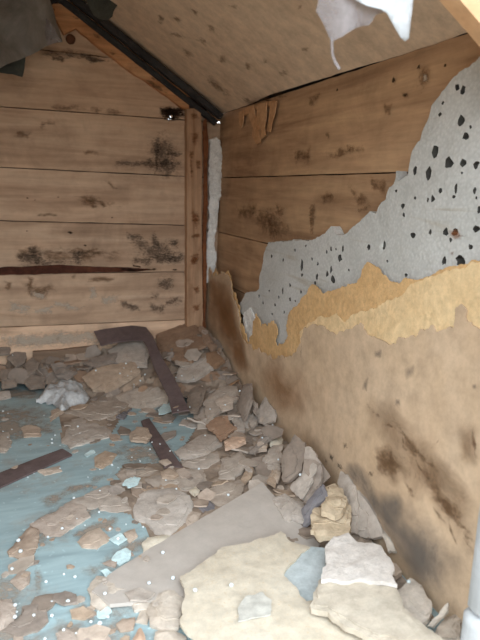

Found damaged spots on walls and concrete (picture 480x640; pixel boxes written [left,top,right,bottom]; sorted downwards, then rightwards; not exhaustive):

leakage [117,138,180,175]
leakage [131,235,184,263]
crack [121,264,156,272]
leakage [353,471,433,566]
leakage [428,477,460,525]